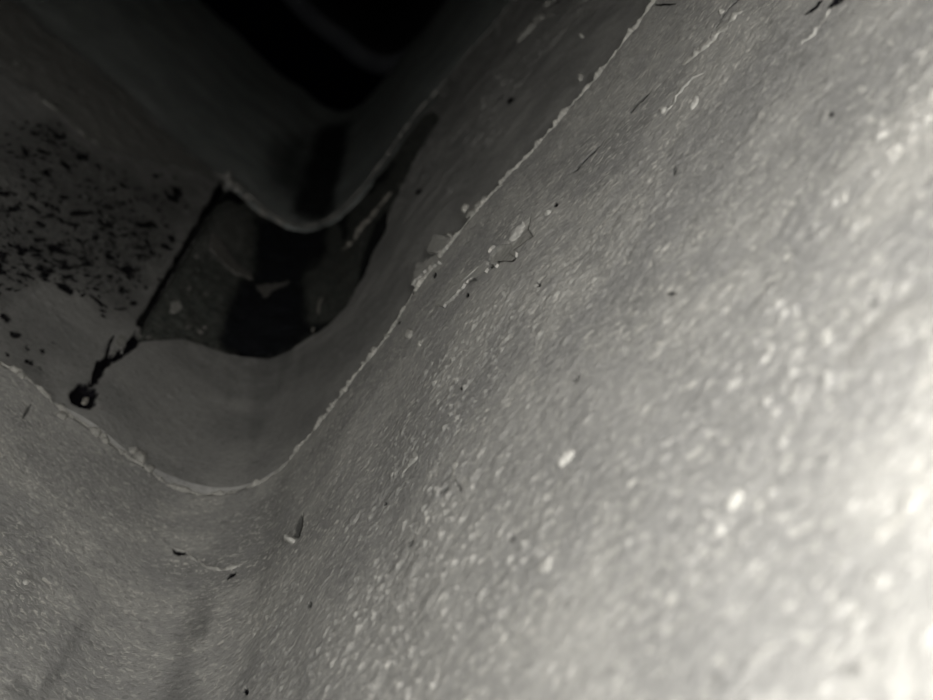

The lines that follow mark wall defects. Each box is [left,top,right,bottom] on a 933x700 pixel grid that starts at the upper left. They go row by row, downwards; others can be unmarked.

spalling [0,121,188,318]
spalling [137,113,439,359]